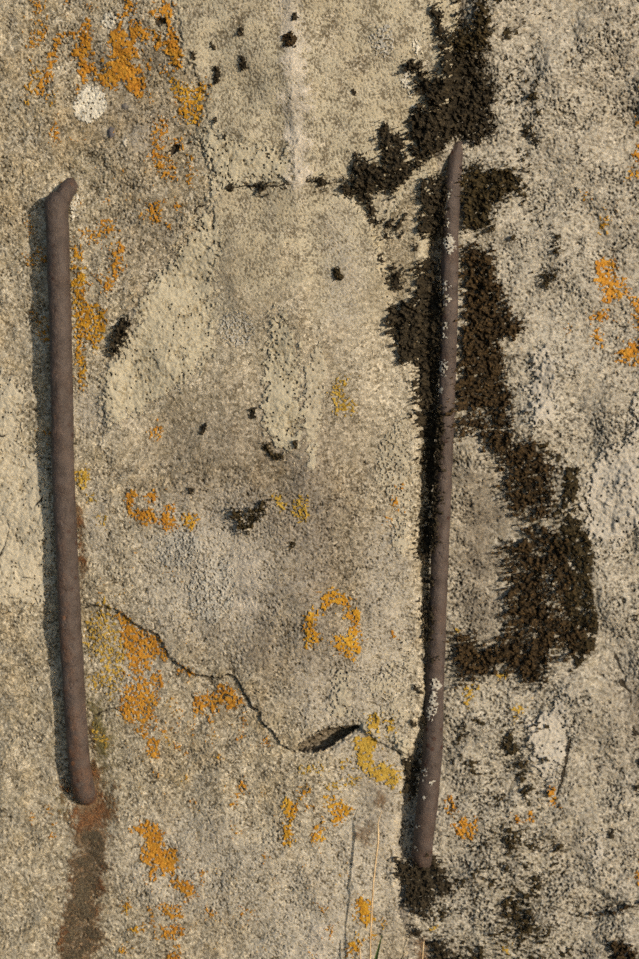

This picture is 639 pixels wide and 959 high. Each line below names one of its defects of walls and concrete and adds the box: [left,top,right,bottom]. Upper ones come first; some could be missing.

corrosion [76,503,89,589]
crack [83,605,292,751]
corrosion [51,760,121,959]